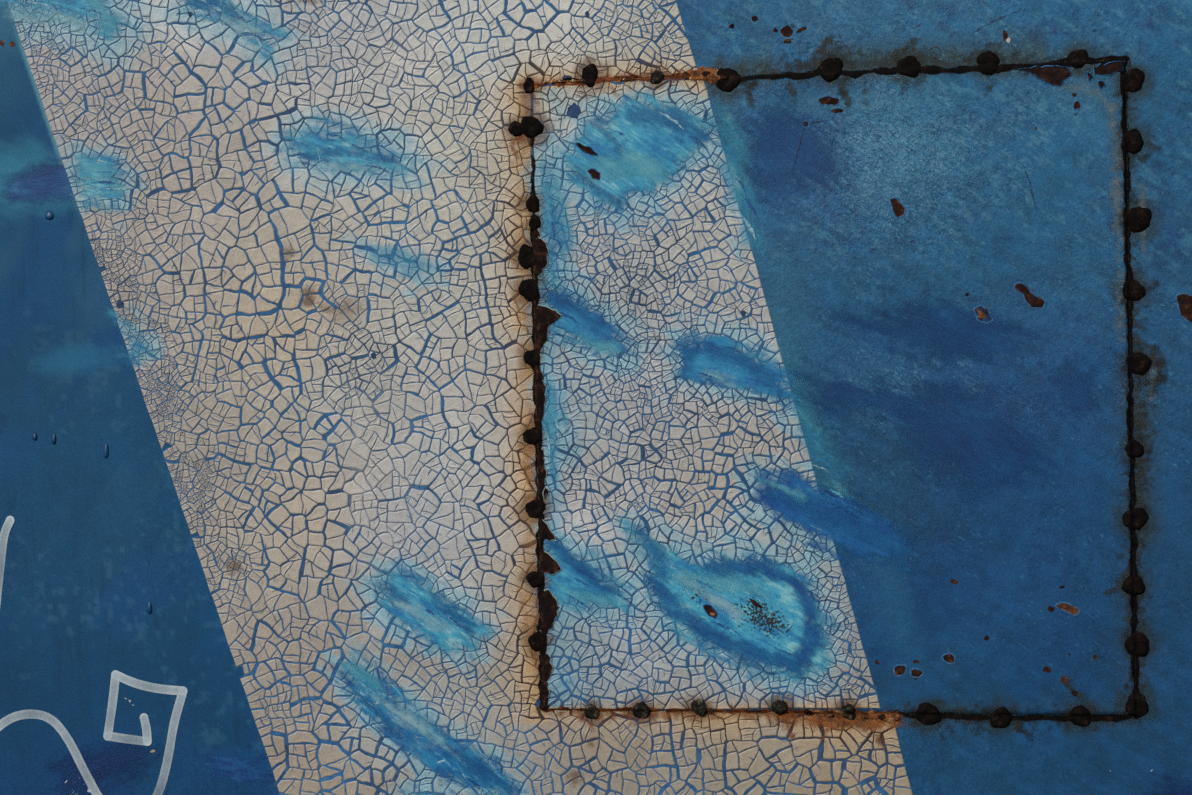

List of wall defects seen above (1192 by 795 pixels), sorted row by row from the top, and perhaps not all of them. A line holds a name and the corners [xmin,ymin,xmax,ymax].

crack [822,35,963,59]
rust [665,66,727,83]
crack [10,0,912,795]
rust [733,709,901,744]